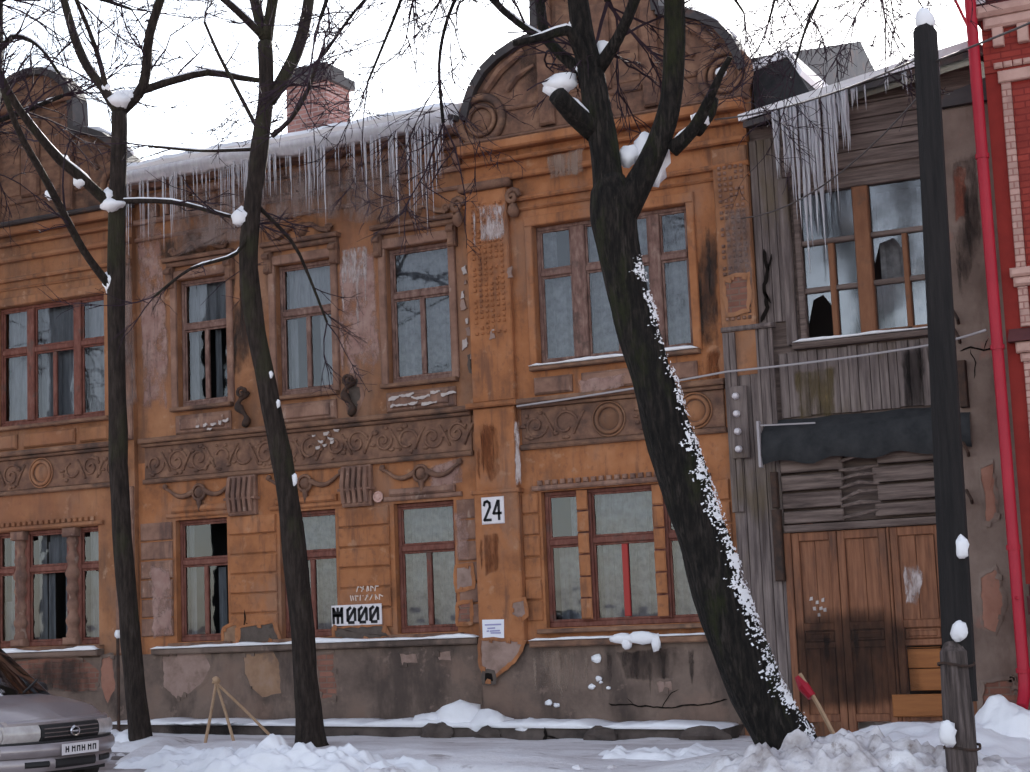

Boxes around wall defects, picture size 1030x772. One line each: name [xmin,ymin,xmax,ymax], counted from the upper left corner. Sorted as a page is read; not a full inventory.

water stain [954,159,980,278]
water stain [699,211,751,342]
peeling [976,564,1008,637]
peeling [160,653,214,702]
peeling [221,621,284,701]